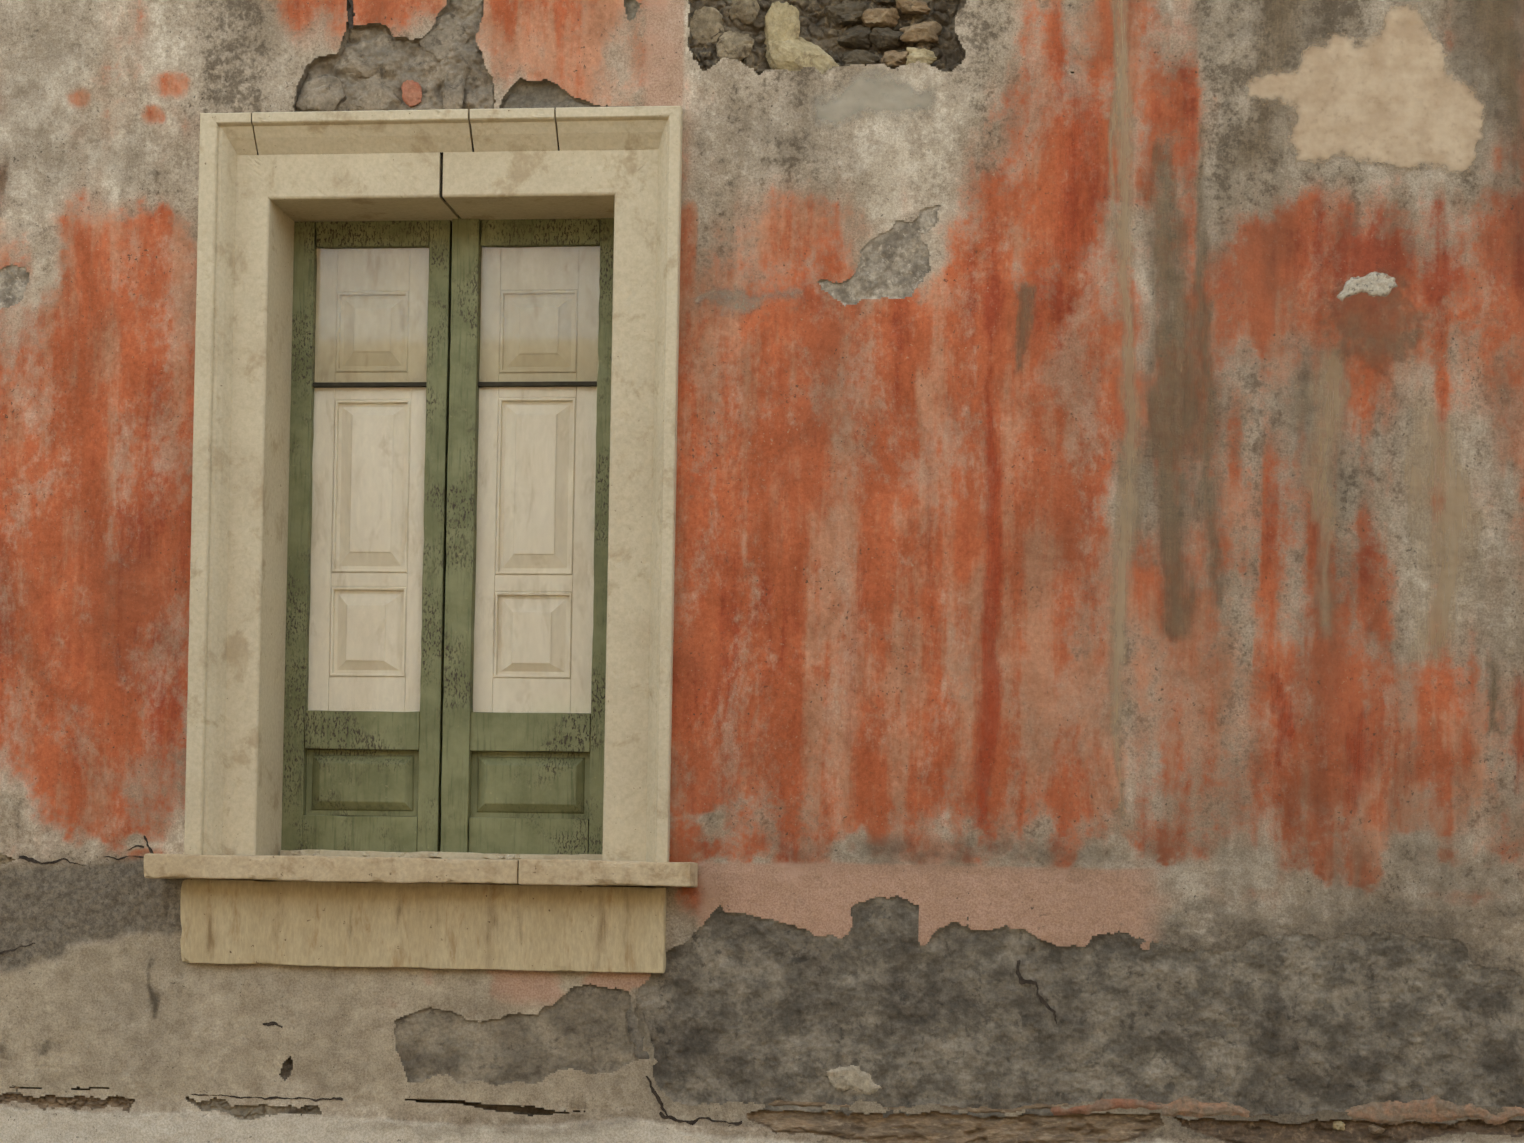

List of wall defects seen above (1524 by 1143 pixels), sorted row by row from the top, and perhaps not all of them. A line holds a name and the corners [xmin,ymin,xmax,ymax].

spalling [624,0,642,22]
spalling [292,0,625,112]
spalling [688,0,966,75]
peeling [817,205,941,306]
peeling [0,264,30,309]
water stain [1110,0,1213,769]
spalling [0,853,15,866]
peeling [394,895,1524,1143]
crack [6,1086,109,1094]
crack [192,1094,343,1102]
crack [405,1099,585,1116]
crack [646,1076,742,1126]